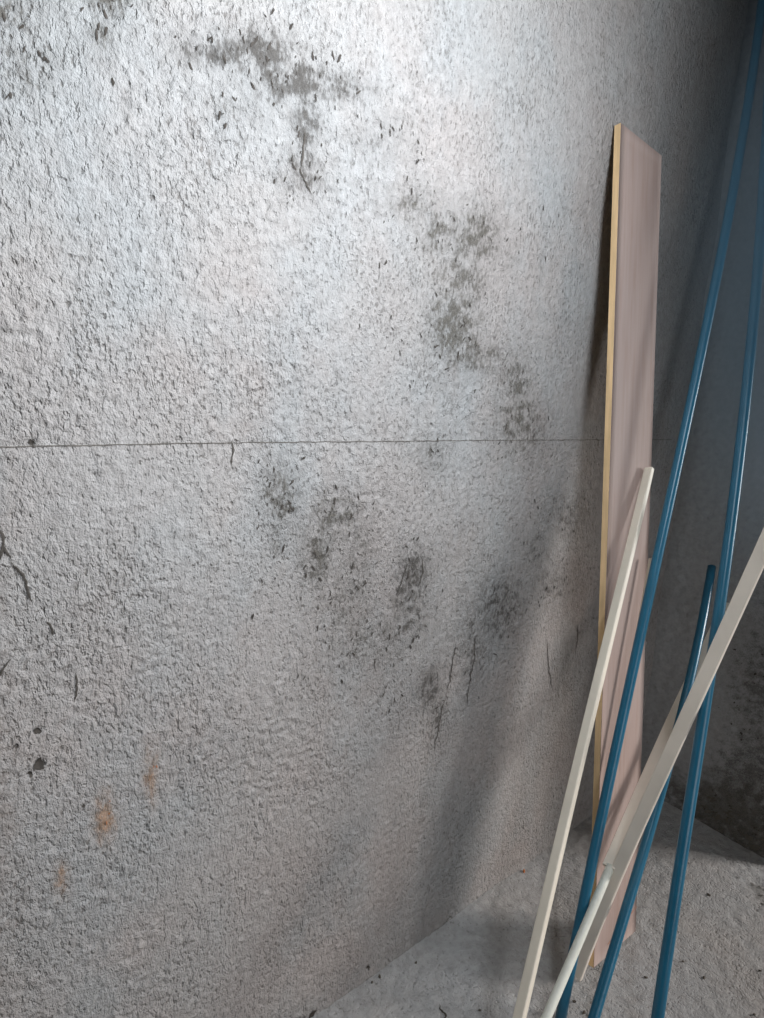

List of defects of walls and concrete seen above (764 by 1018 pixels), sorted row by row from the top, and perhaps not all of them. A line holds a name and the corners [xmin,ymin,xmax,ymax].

damp [96,0,133,40]
damp [185,7,342,193]
damp [429,204,496,372]
damp [498,365,549,453]
crack [0,530,32,602]
damp [258,459,294,516]
damp [303,485,359,615]
damp [339,537,431,683]
damp [694,650,764,858]